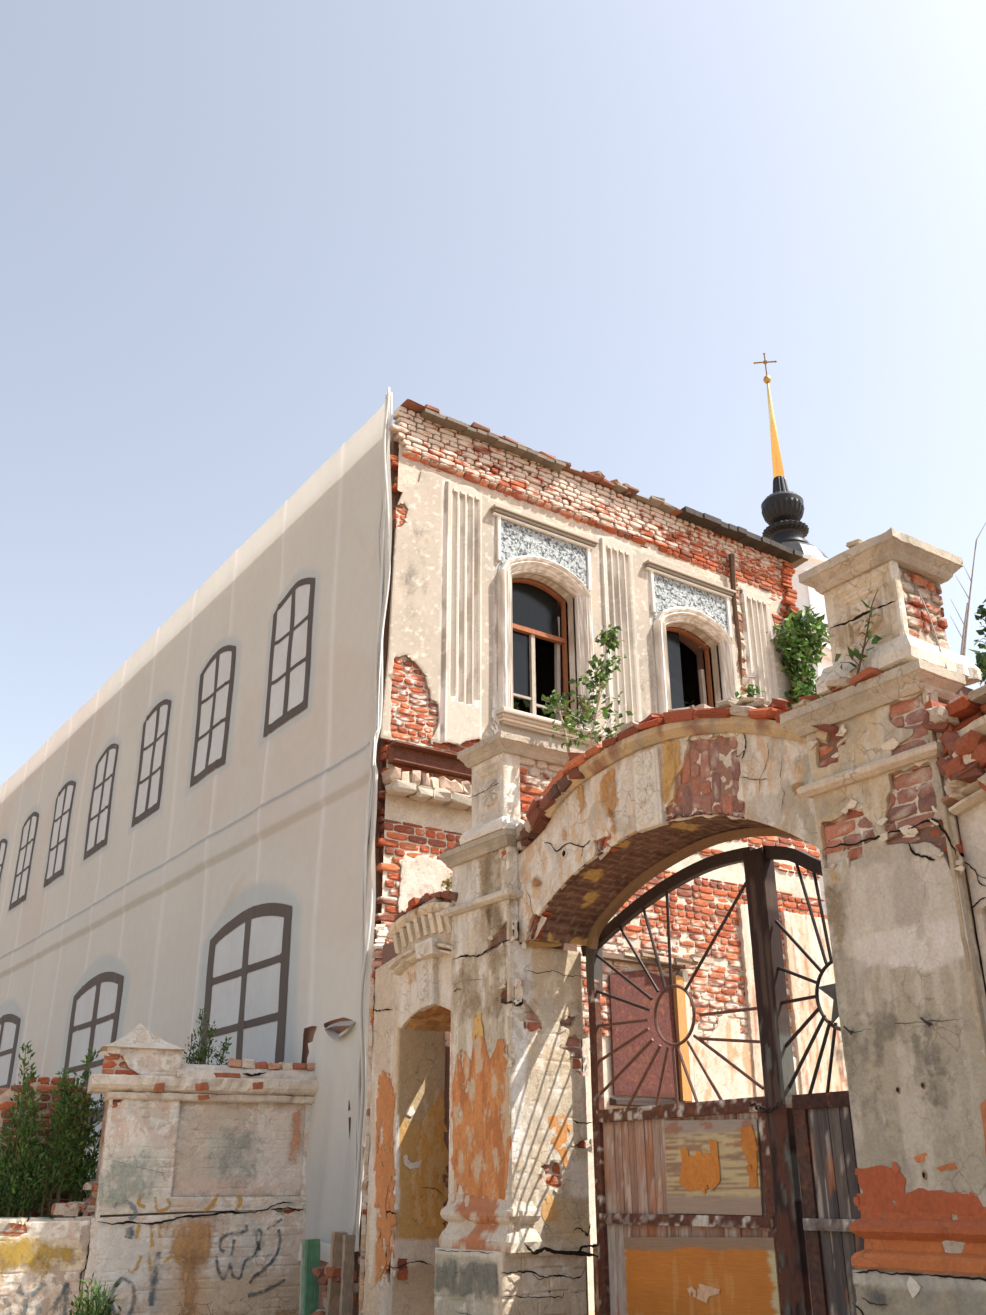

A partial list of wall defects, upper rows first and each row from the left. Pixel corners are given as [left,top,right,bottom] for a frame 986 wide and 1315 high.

flaking render [384,655,479,754]
flaking render [663,733,746,823]
spalling [823,692,986,874]
flaking render [498,979,590,1078]
peeling [312,952,517,1315]
peeling [538,1113,593,1222]
peeling [853,1153,983,1220]
crack [79,1202,299,1310]
flaking render [907,1276,921,1298]